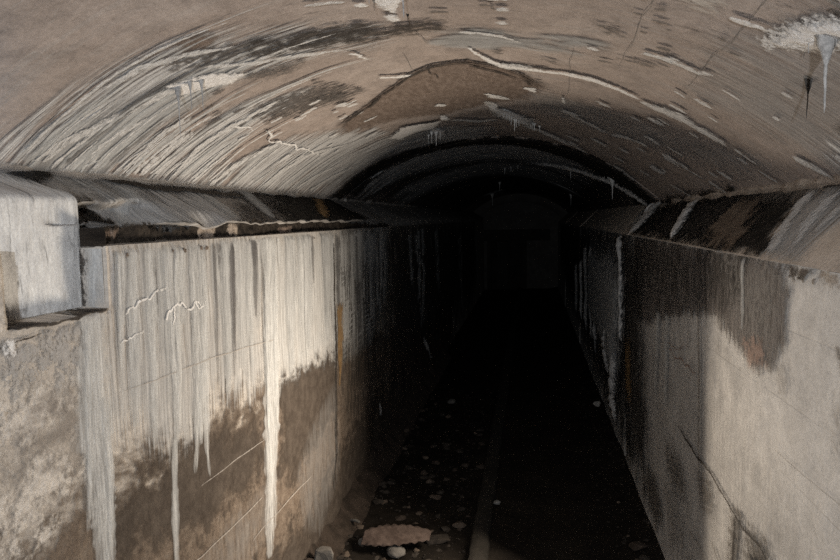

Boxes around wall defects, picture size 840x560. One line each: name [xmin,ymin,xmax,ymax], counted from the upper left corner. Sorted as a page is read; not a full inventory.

crack [0,288,206,357]
water stain [0,11,595,560]
crack [667,303,766,560]
water stain [727,506,770,560]